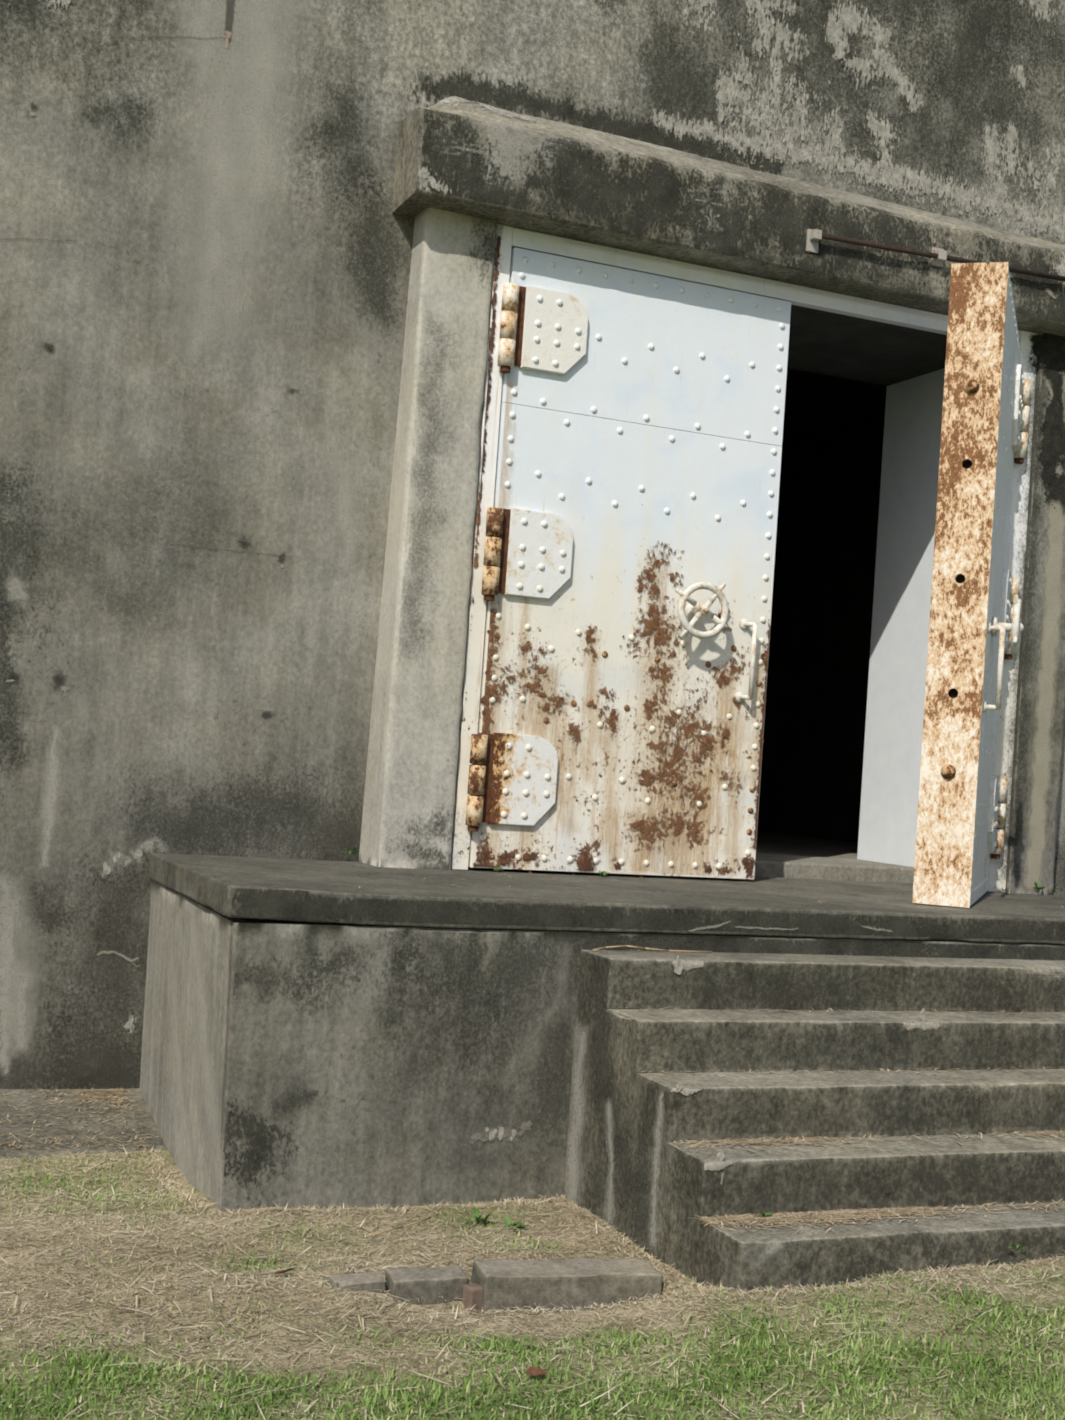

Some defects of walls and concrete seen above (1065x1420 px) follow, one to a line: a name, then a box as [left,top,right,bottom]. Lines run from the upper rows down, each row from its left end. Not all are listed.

rust [224,0,235,48]
damp [408,0,1065,323]
damp [0,468,52,767]
damp [1001,341,1065,891]
damp [41,730,59,866]
damp [0,869,150,1089]
damp [126,773,362,861]
damp [189,905,317,1205]
damp [404,812,451,868]
damp [231,888,1065,1244]